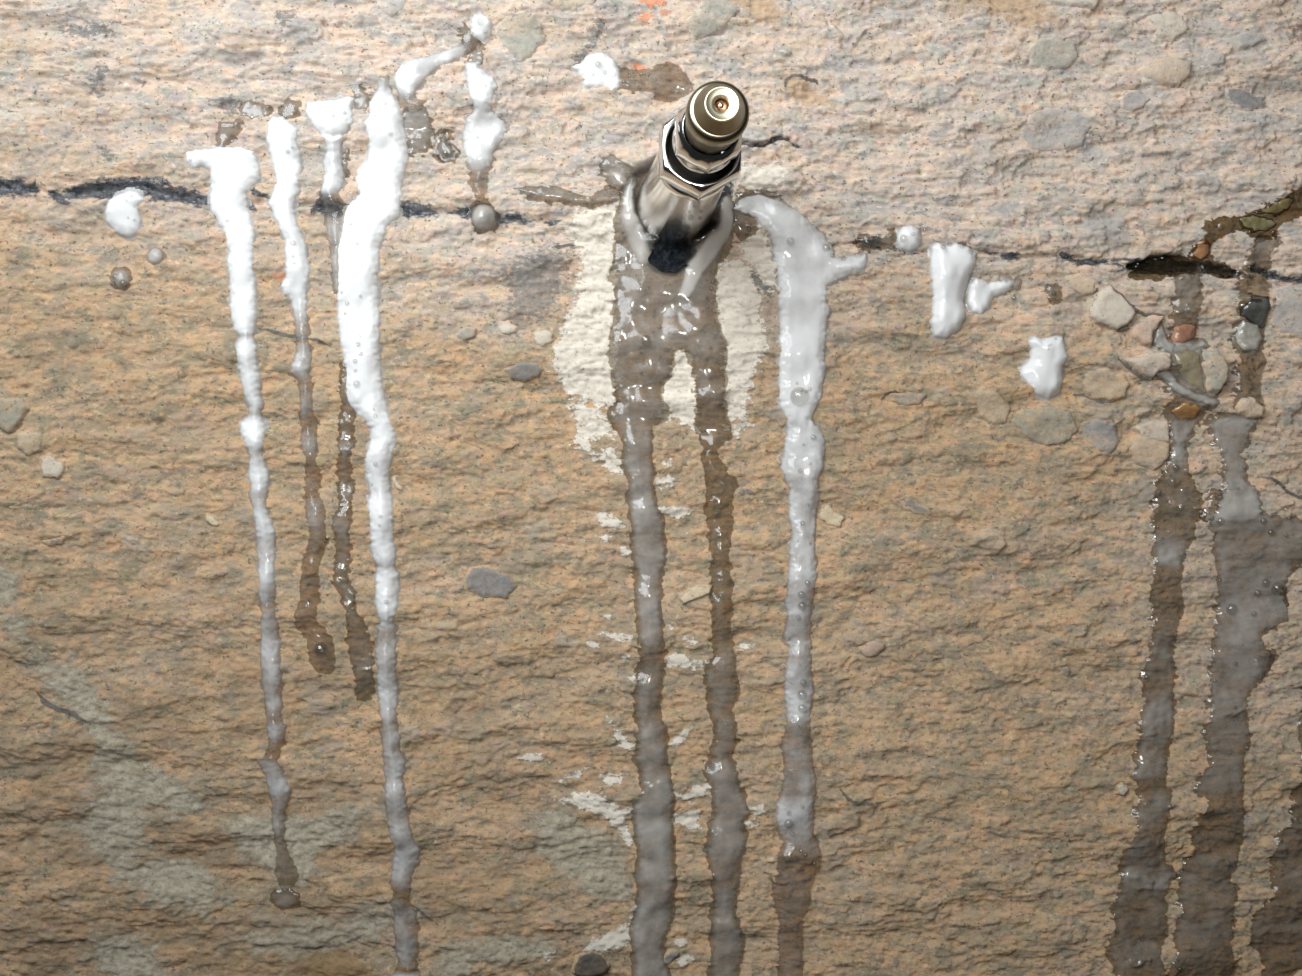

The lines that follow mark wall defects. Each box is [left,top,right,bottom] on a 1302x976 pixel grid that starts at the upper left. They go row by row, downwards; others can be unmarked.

crack [0,176,209,208]
crack [248,188,270,210]
crack [311,190,349,218]
crack [400,200,575,248]
leakage [731,153,792,196]
crack [1201,265,1302,284]
leakage [547,200,627,475]
leakage [709,221,781,439]
crack [958,243,1169,403]
leakage [657,346,702,436]
leakage [0,567,236,920]
leakage [524,767,637,953]